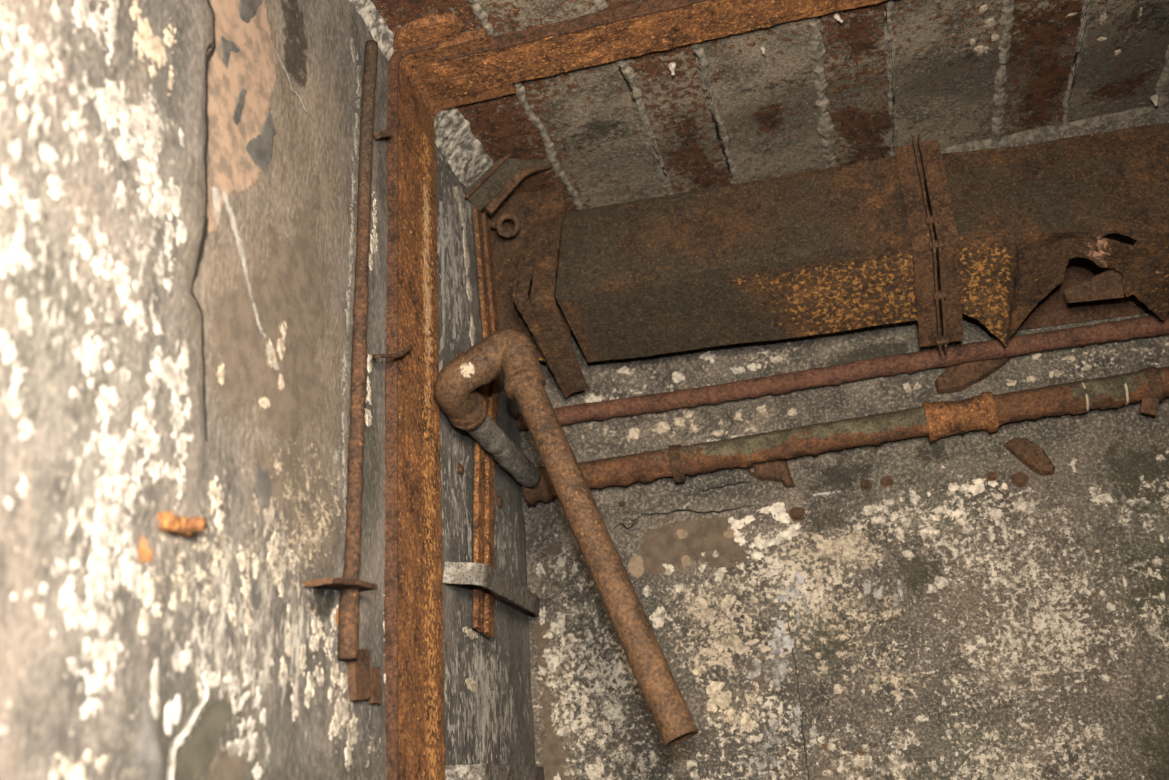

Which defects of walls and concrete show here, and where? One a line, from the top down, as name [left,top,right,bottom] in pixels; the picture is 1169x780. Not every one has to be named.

peeling [0,2,65,121]
rust [834,7,884,73]
rust [1008,0,1092,129]
peeling [0,139,65,278]
rust [659,112,730,190]
rust [831,103,896,166]
peeling [0,297,35,444]
peeling [11,0,382,780]
damp [1068,450,1169,543]
damp [529,541,674,780]
damp [643,478,1116,780]
damp [1122,556,1169,648]